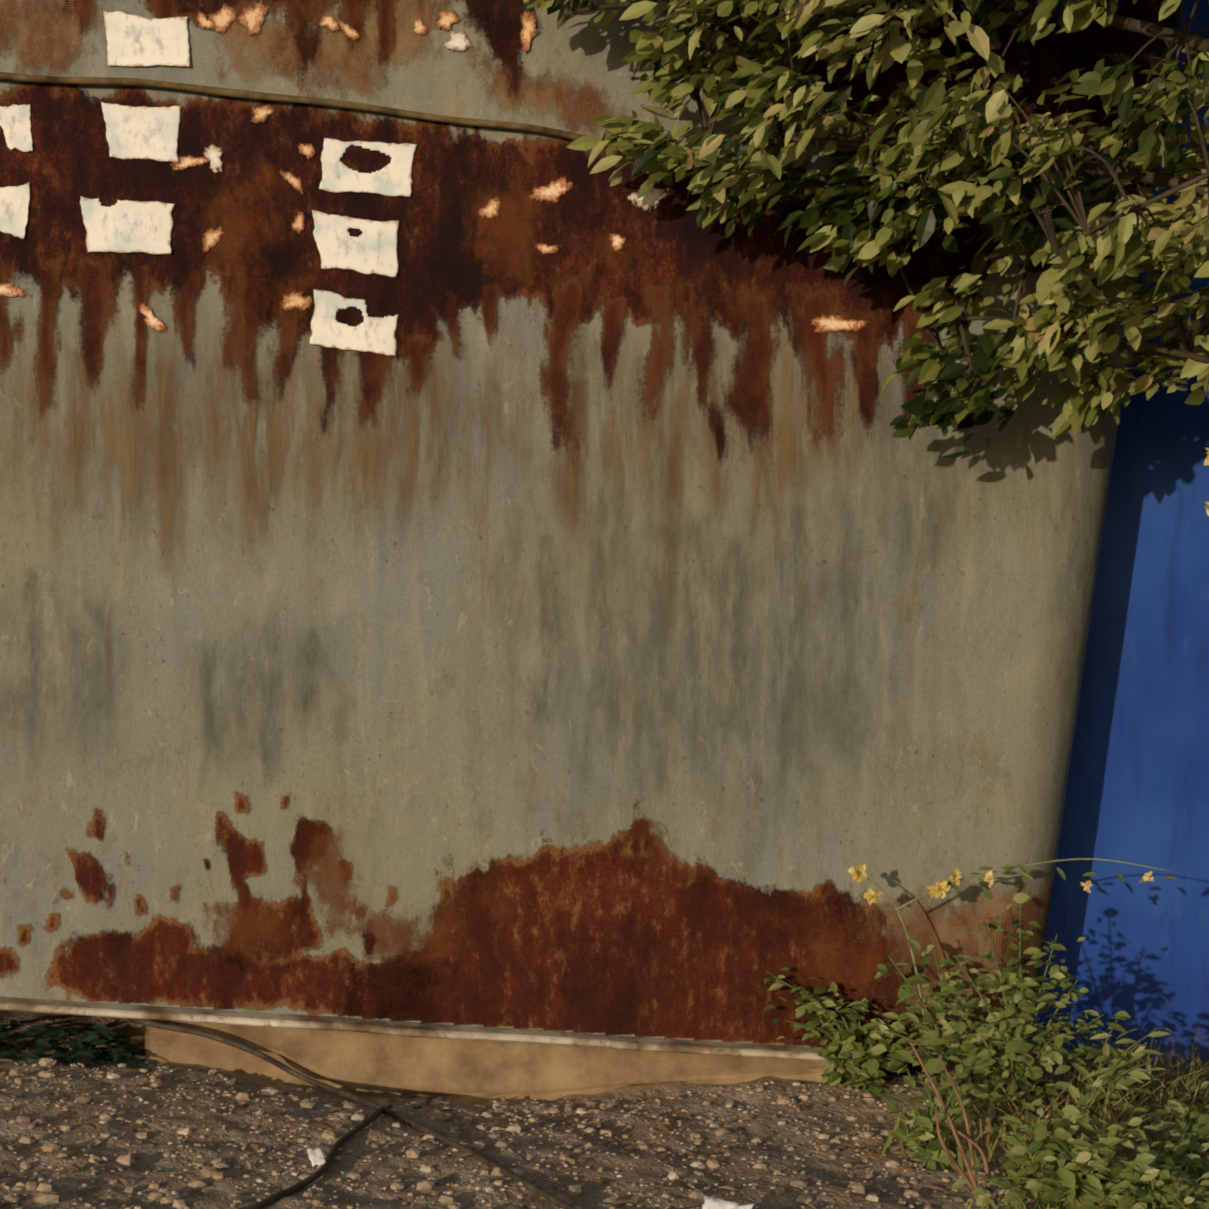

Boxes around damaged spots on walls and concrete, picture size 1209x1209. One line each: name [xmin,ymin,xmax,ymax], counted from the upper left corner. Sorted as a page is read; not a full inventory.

peeling [413,9,472,52]
corrosion [782,0,1180,203]
corrosion [0,0,992,499]
corrosion [0,792,1052,1053]